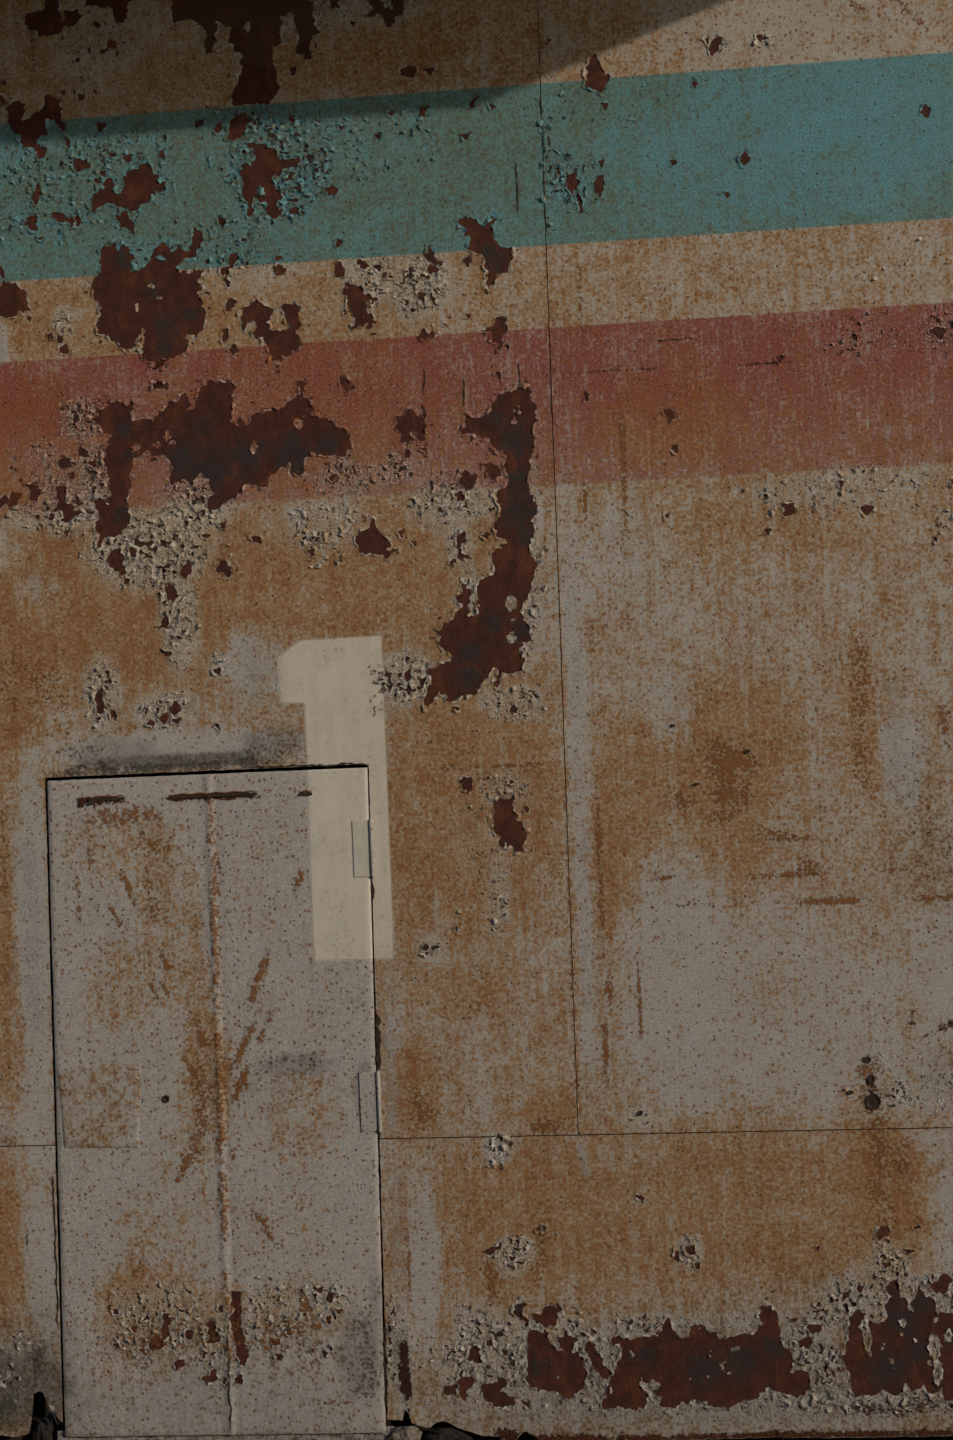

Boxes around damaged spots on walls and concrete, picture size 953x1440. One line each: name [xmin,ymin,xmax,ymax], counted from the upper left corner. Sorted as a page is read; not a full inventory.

peeling [0,0,405,586]
peeling [416,211,518,307]
peeling [391,370,550,714]
peeling [457,773,536,855]
rust [670,735,762,827]
rust [796,896,871,908]
rust [75,792,261,1242]
rust [602,975,614,1088]
rust [856,1057,912,1246]
peeling [112,1287,251,1389]
rust [113,1268,322,1376]
peeling [443,1224,953,1420]